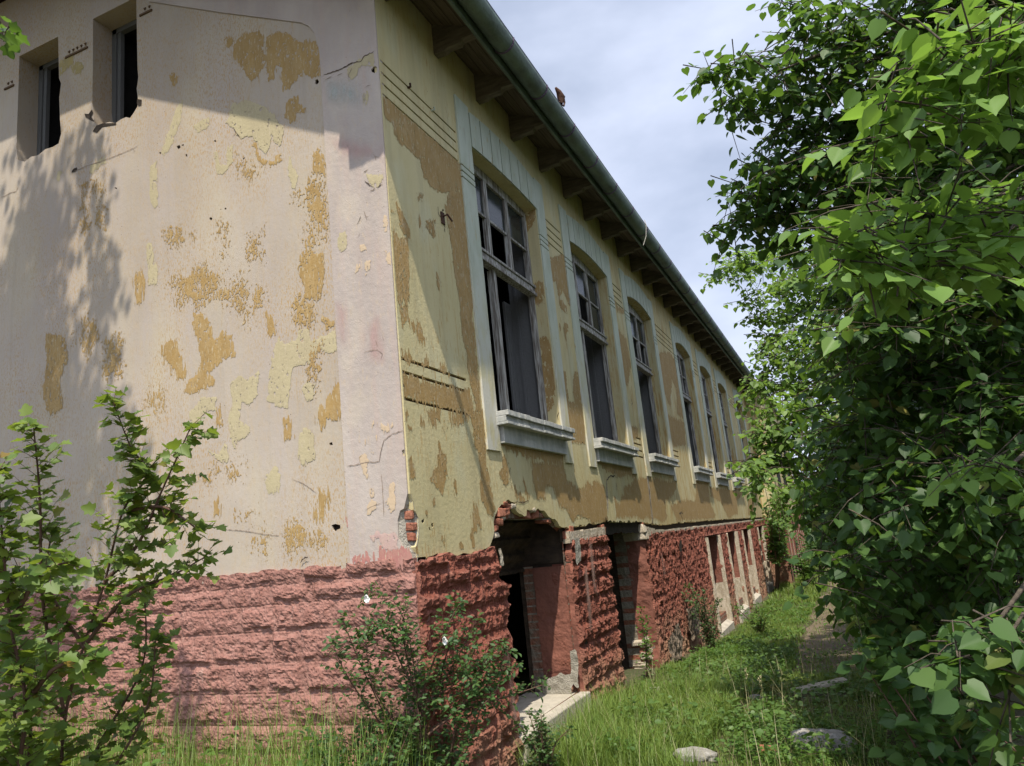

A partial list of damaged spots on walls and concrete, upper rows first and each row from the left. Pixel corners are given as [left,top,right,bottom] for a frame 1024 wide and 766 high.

crack [324,51,374,87]
peeling [132,30,371,486]
peeling [43,312,128,419]
peeling [359,97,763,566]
crack [349,431,401,515]